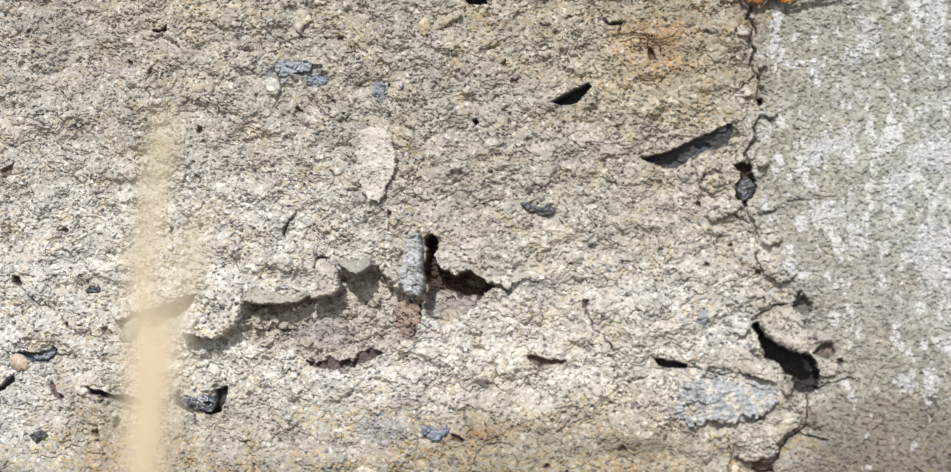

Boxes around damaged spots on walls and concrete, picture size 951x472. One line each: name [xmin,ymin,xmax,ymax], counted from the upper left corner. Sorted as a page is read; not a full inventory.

crack [697,3,775,199]
crack [782,194,842,217]
peeling [98,291,129,339]
spalling [238,232,540,372]
flaking render [626,289,858,427]
crack [725,392,831,472]